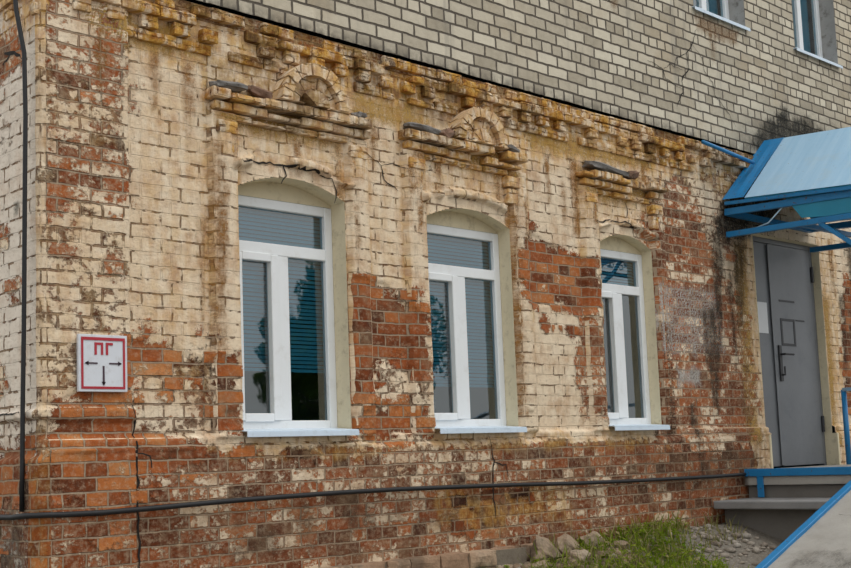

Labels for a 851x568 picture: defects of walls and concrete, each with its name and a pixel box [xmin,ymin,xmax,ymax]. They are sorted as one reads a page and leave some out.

flaking render [0,14,23,104]
flaking render [45,0,146,115]
flaking render [46,123,136,224]
crack [242,159,337,203]
flaking render [48,241,82,259]
flaking render [100,252,124,279]
flaking render [347,273,436,458]
flaking render [511,212,609,424]
flaking render [838,273,851,415]
flaking render [0,434,36,511]
flaking render [47,318,263,553]
spalling [286,446,321,466]